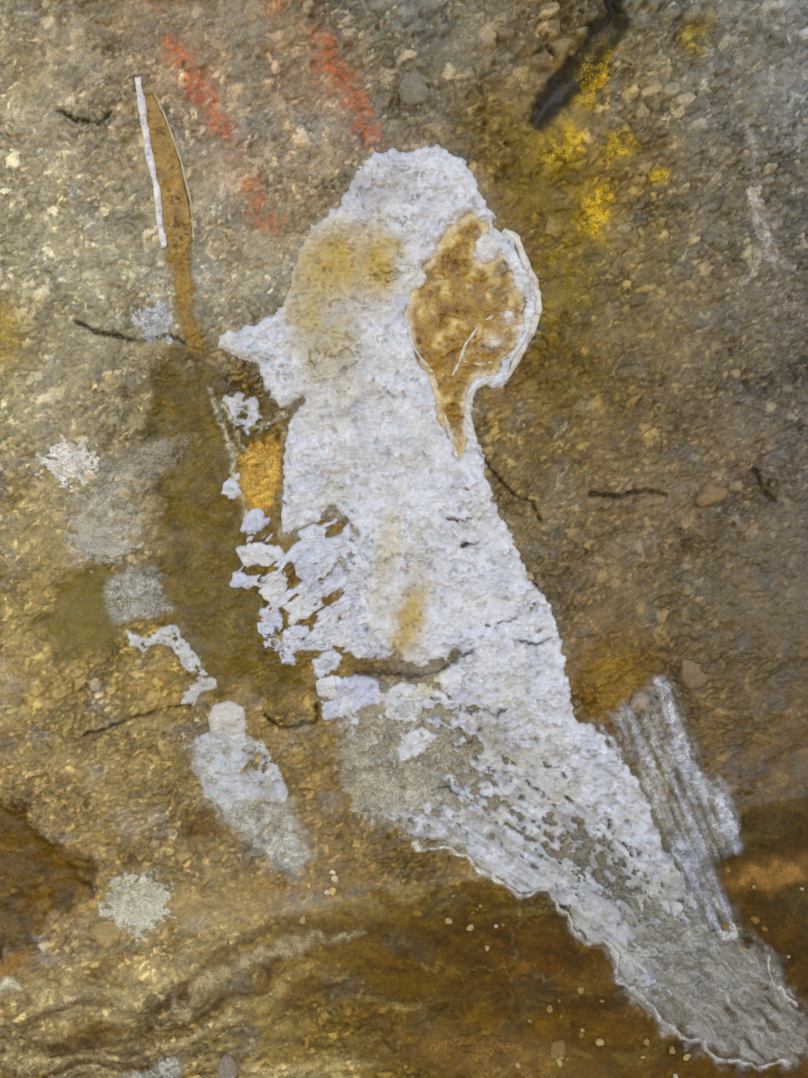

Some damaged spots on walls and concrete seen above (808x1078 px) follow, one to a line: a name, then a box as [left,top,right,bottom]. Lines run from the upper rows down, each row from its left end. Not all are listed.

water stain [576,44,611,104]
water stain [519,126,583,208]
water stain [606,136,632,158]
water stain [745,120,798,274]
crack [76,321,186,344]
water stain [131,293,183,359]
water stain [35,356,303,706]
water stain [218,144,808,1069]
water stain [188,701,310,874]
water stain [94,866,176,942]
water stain [171,930,364,1022]
water stain [131,1058,181,1078]